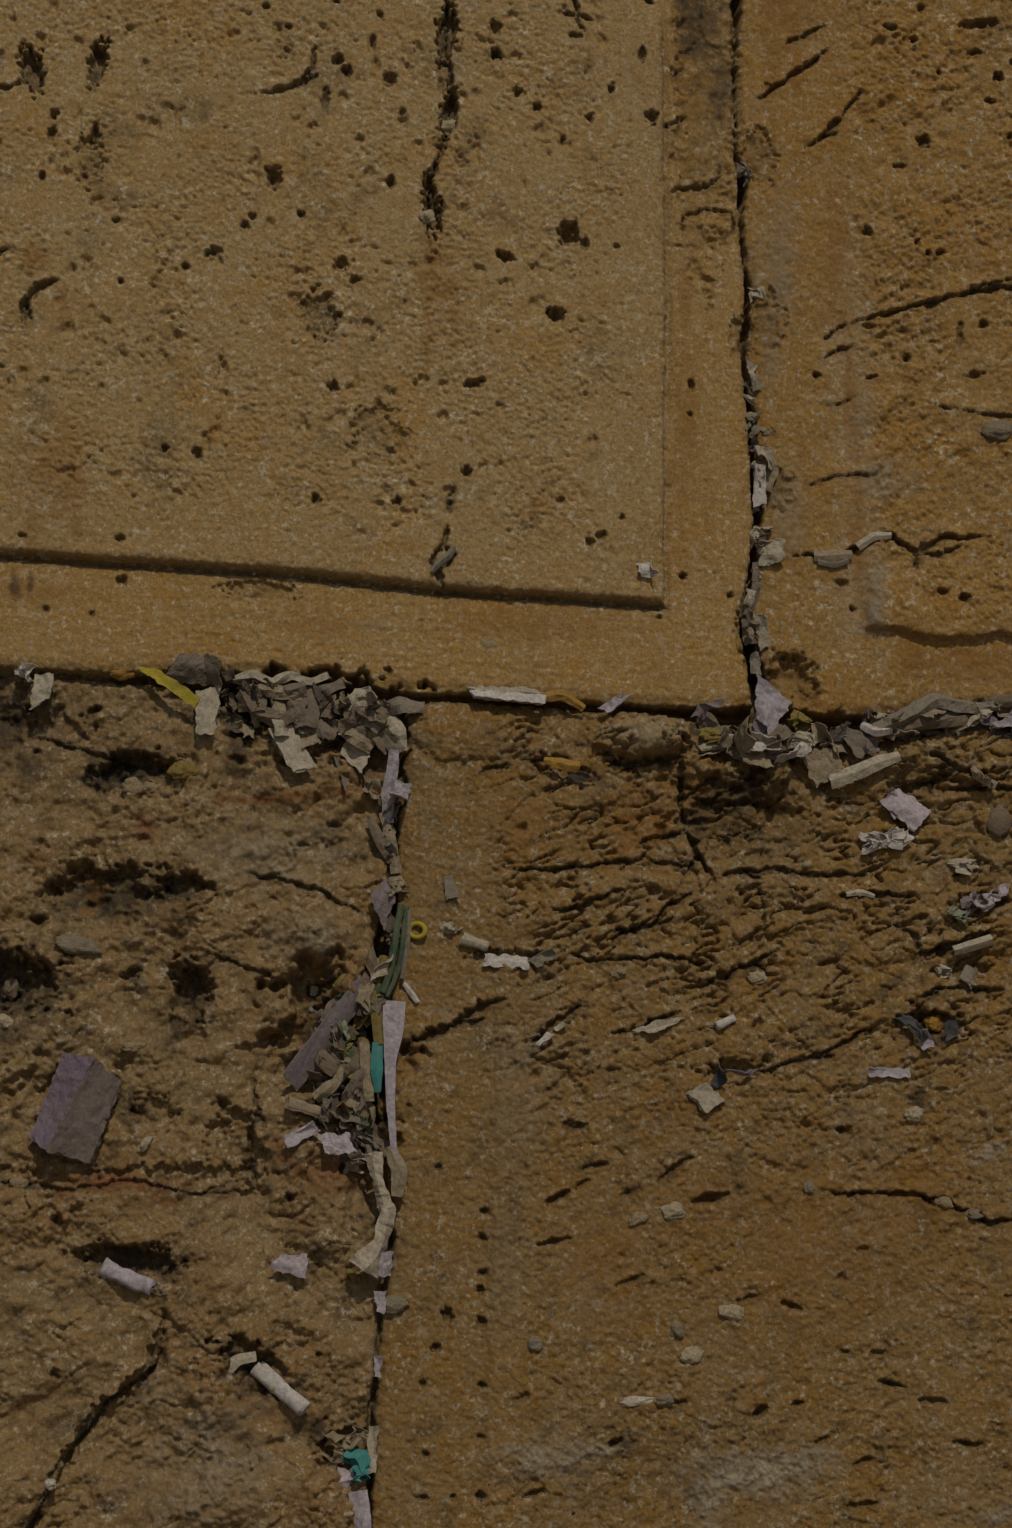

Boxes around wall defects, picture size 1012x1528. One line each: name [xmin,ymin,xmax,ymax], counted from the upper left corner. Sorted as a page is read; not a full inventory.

crack [264,46,318,95]
crack [758,26,827,100]
crack [810,93,862,147]
crack [828,282,1012,357]
crack [397,751,412,811]
crack [515,755,1012,1035]
crack [408,999,506,1046]
crack [534,1005,582,1042]
crack [753,1028,871,1075]
crack [1,1078,267,1197]
crack [829,1190,1010,1229]
crack [26,1309,169,1528]